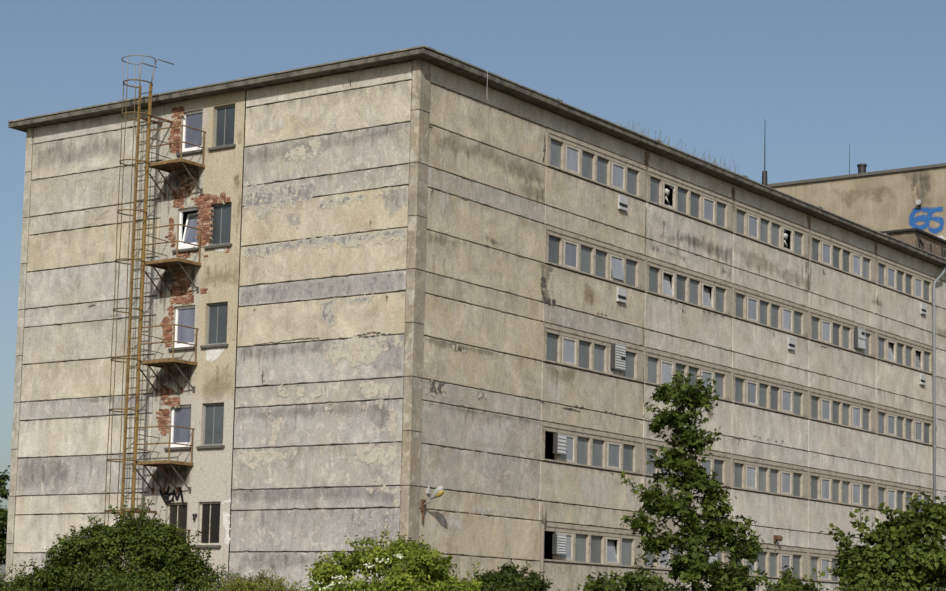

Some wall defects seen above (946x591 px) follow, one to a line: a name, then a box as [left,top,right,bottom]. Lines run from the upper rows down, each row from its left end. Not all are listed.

flaking render [167,104,185,154]
flaking render [160,170,230,347]
peeling [205,344,225,362]